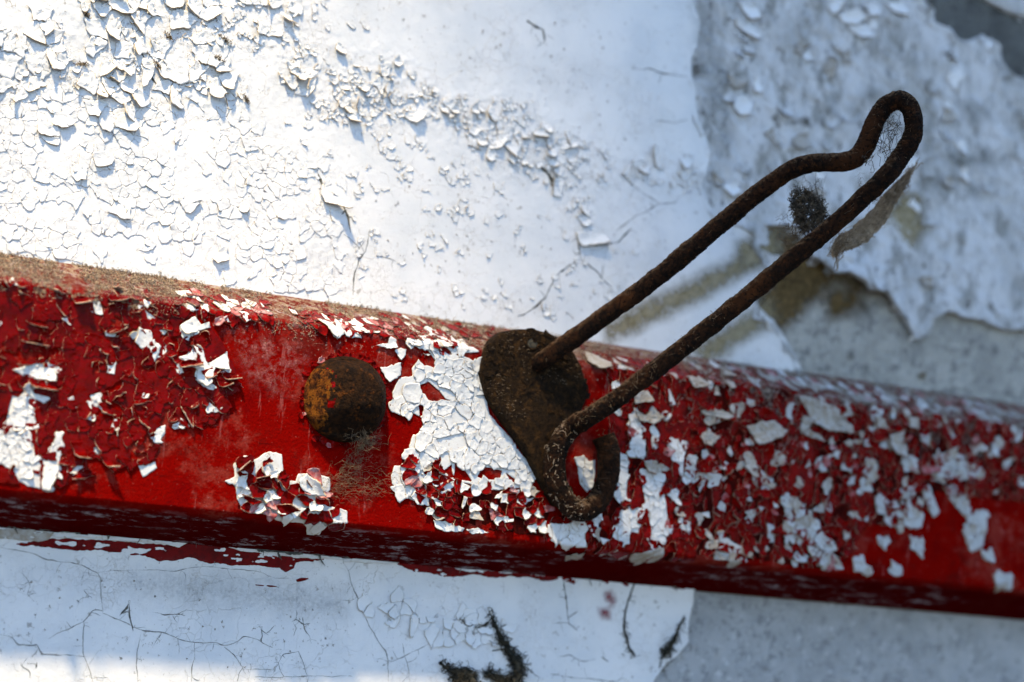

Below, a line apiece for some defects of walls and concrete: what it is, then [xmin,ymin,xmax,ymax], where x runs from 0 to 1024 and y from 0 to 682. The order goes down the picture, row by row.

peeling [0,0,618,304]
peeling [722,75,763,116]
peeling [827,0,1024,192]
rust [884,193,928,252]
rust [604,227,800,341]
rust [695,256,865,360]
peeling [0,272,275,492]
peeling [225,247,1024,593]
crack [0,526,428,682]
crack [525,651,629,682]
crack [558,578,601,631]
crack [627,584,685,673]